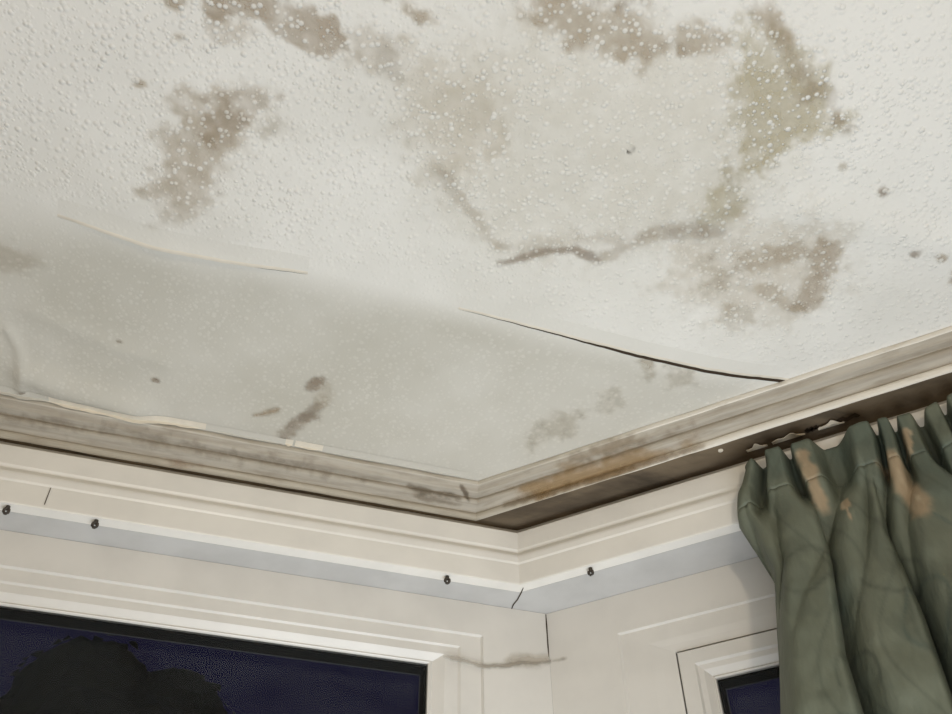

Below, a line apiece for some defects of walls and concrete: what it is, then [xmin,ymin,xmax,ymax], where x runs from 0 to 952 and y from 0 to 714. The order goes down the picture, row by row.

crack [446,614,549,668]